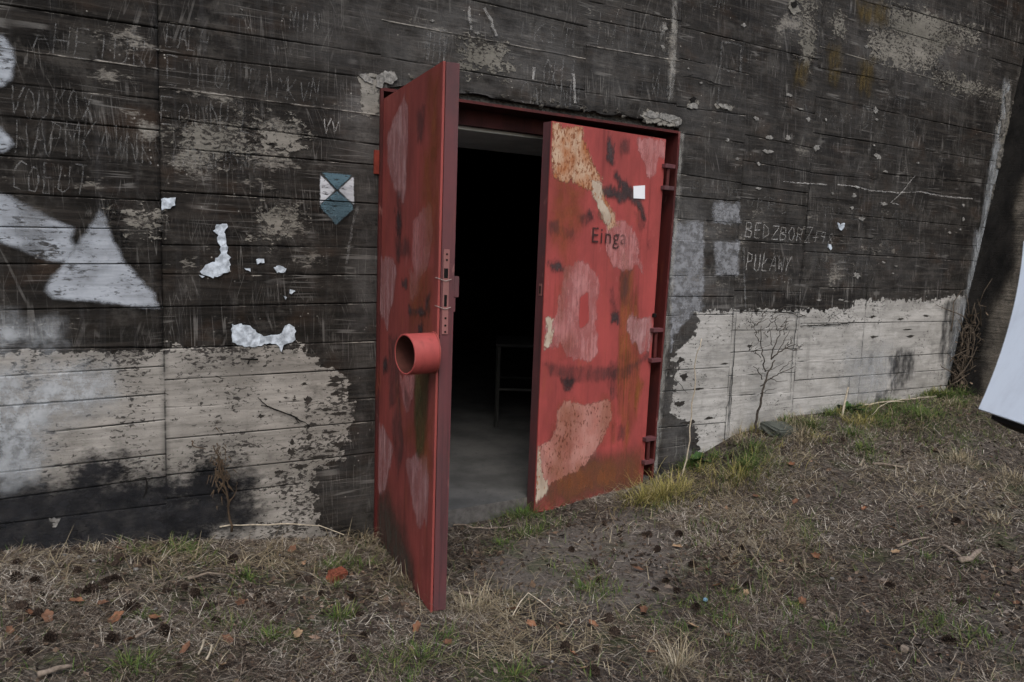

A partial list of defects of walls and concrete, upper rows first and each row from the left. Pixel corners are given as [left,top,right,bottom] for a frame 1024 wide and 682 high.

peeling [357,71,415,117]
spalling [455,28,700,130]
rust [551,122,617,230]
peeling [670,295,966,453]
peeling [0,340,357,540]